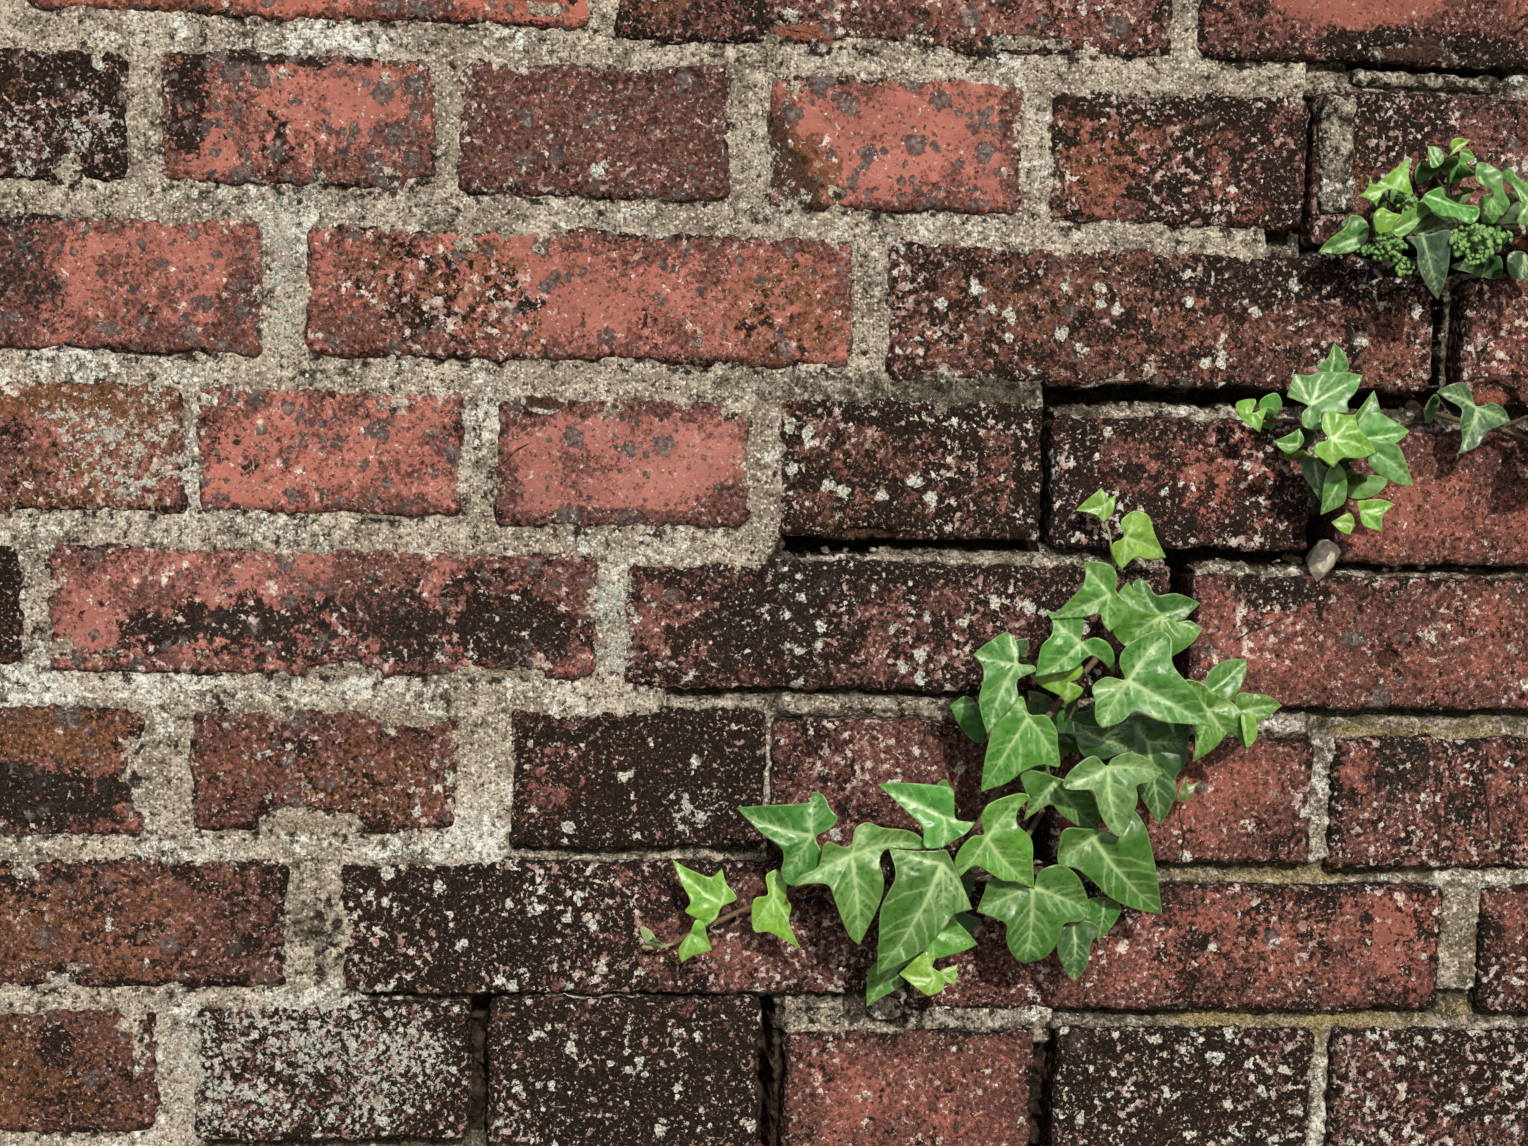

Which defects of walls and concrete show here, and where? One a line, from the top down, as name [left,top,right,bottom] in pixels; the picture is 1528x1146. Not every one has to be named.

crack [1346,63,1504,80]
crack [1299,248,1521,413]
crack [1041,383,1308,422]
crack [782,536,1045,558]
crack [1162,513,1517,594]
crack [1232,618,1284,644]
crack [1028,813,1047,862]
crack [1178,802,1186,861]
crack [1423,775,1442,864]
crack [1481,743,1490,834]
crack [755,994,785,1146]
crack [1027,1042,1050,1146]